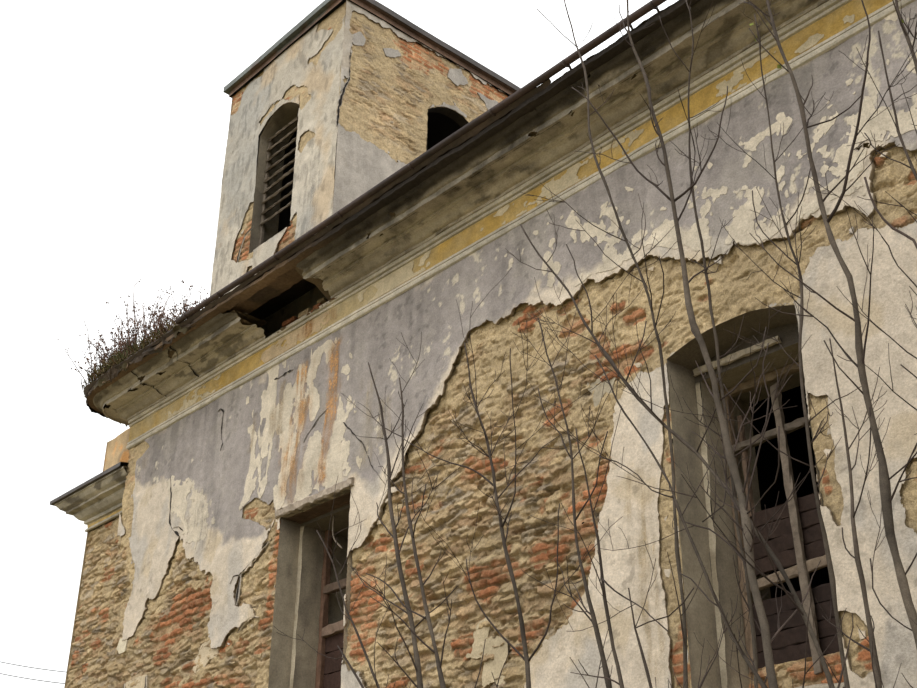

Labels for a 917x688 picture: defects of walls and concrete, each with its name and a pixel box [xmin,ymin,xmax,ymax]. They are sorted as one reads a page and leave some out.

spalling [231,71,264,115]
spalling [259,84,312,130]
spalling [307,2,508,164]
peeling [716,50,776,97]
spalling [298,129,315,153]
spalling [231,201,254,273]
spalling [273,212,297,255]
spalling [277,297,337,333]
spalling [342,61,917,688]
spalling [65,337,362,688]